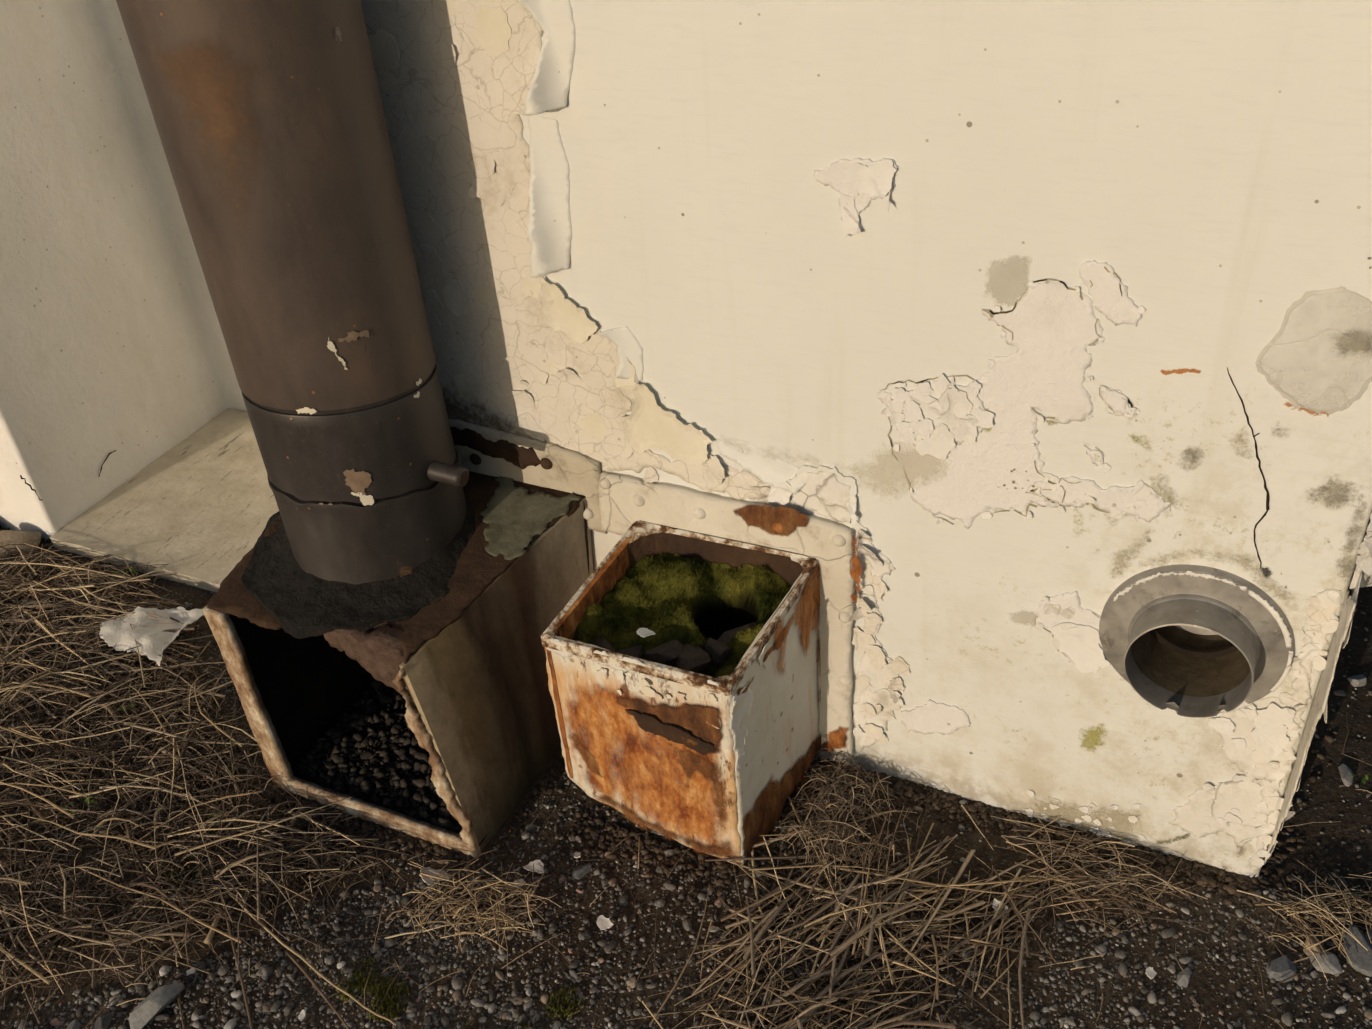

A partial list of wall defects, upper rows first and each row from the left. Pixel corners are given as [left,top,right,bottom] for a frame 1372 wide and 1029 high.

damp [988,257,1027,304]
peeling [360,0,910,750]
peeling [877,260,1172,529]
crack [1227,368,1270,569]
corrosion [734,505,808,536]
peeling [1034,591,1110,673]
peeling [706,679,753,772]
peeling [1168,513,1372,869]
peeling [1025,789,1147,846]